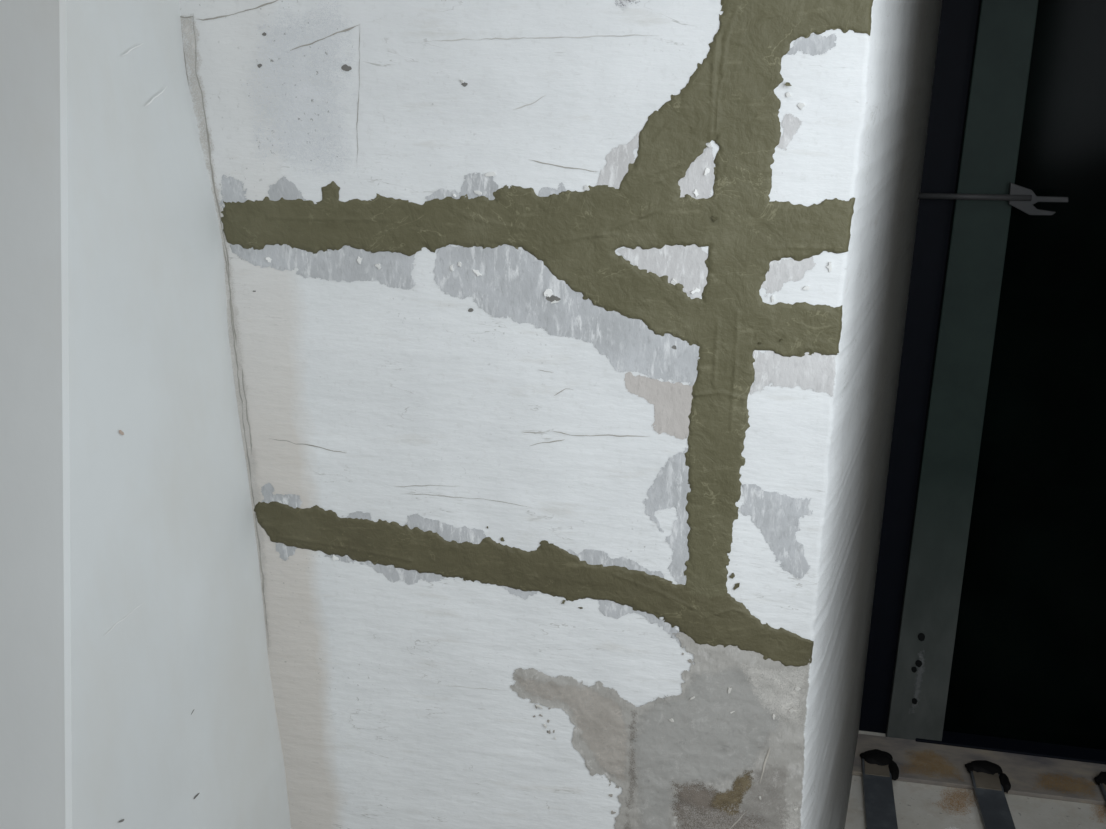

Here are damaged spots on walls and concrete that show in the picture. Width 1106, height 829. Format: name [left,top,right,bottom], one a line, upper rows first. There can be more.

crack [427,34,654,42]
crack [290,25,360,155]
peeling [425,172,498,201]
peeling [538,182,566,197]
crack [528,159,597,172]
crack [180,0,345,653]
peeling [433,244,708,585]
crack [524,431,647,446]
crack [398,485,531,508]
peeling [739,484,813,579]
spalling [510,600,810,829]
water stain [670,762,792,829]